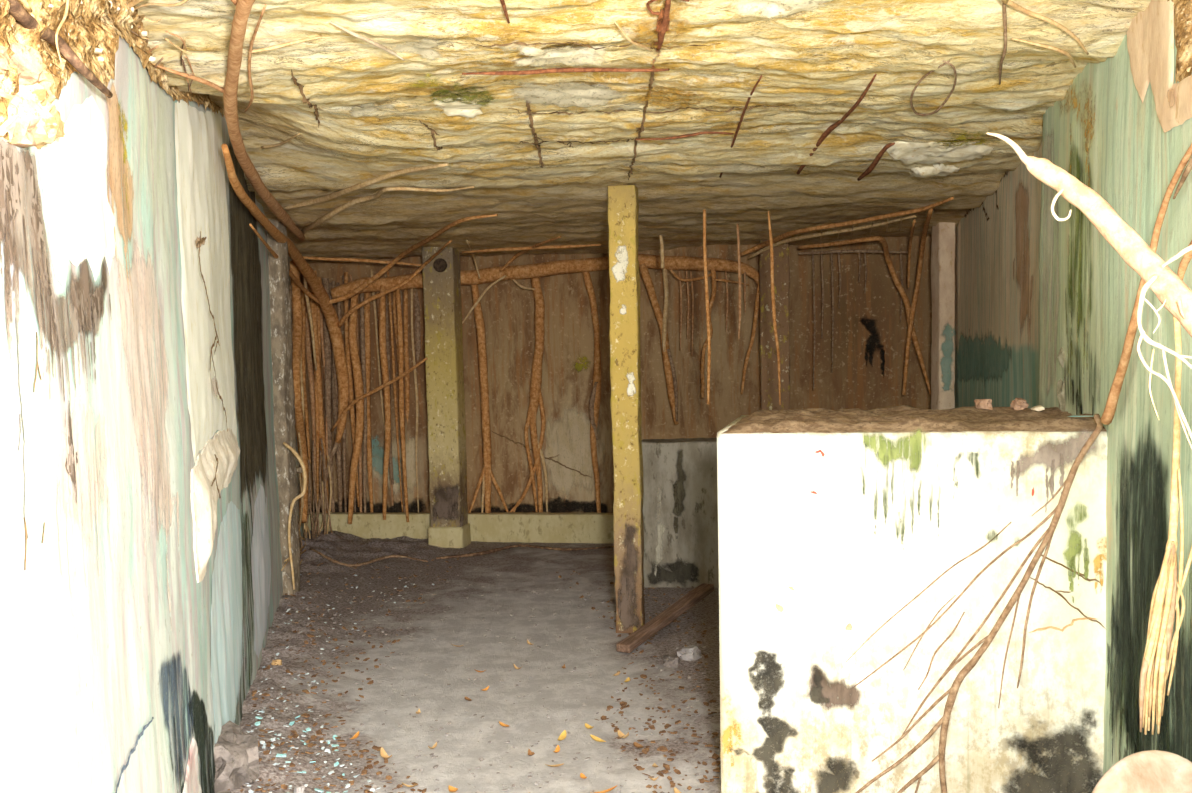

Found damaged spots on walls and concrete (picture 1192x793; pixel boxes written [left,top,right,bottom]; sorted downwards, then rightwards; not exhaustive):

flaking render [0,0,224,284]
crack [291,70,320,128]
corrosion [462,0,689,75]
crack [477,41,795,180]
peeling [1126,0,1192,133]
damp [0,83,179,630]
damp [862,430,939,541]
damp [1005,428,1192,793]
damp [729,650,798,793]
damp [808,665,860,710]
damp [817,758,857,793]